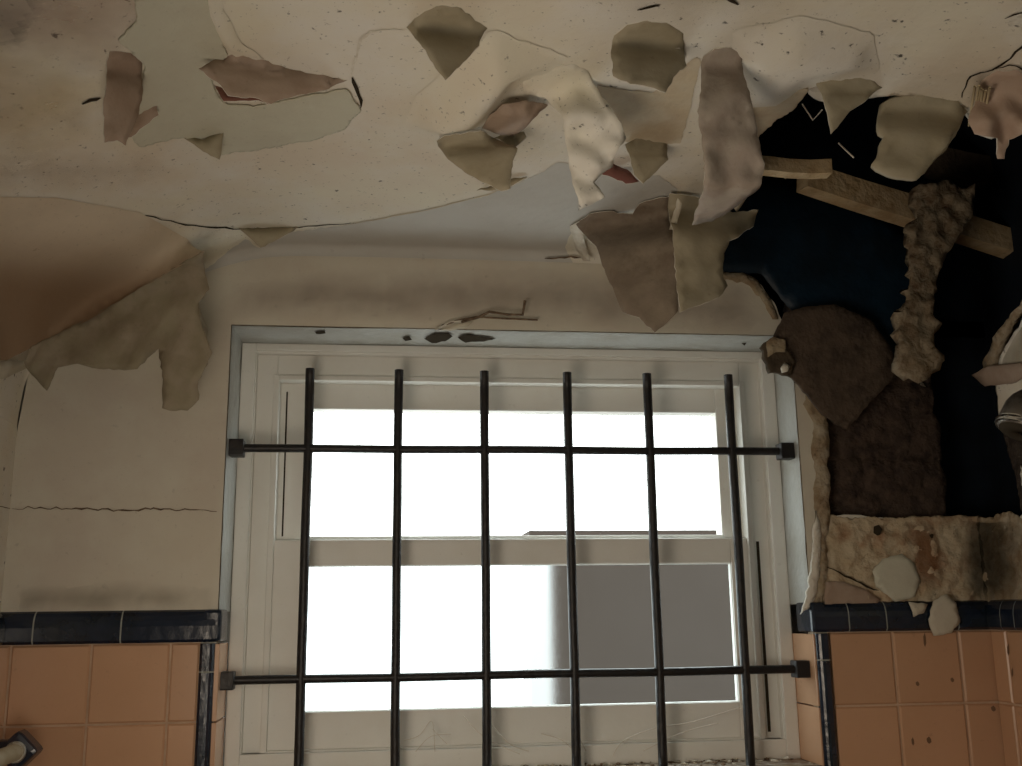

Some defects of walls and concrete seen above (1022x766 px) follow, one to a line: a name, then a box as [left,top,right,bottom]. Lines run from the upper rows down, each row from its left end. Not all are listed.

crack [0,505,217,513]
peeling [0,0,808,411]
spalling [759,69,1022,636]
crack [961,12,1022,98]